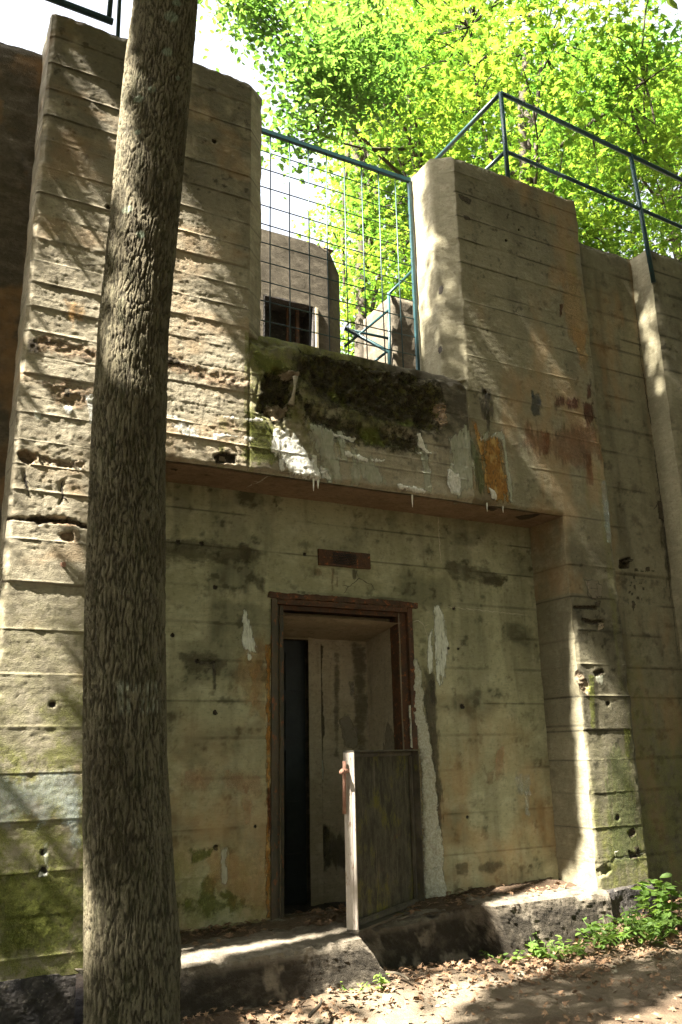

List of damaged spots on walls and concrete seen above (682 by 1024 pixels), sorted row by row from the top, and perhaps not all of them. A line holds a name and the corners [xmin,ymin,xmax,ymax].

spalling [28,336,97,362]
spalling [168,350,448,454]
corrosion [555,384,594,426]
spalling [17,449,85,468]
corrosion [472,421,513,503]
spalling [6,516,87,542]
spalling [575,669,604,695]
hole [627,828,640,859]